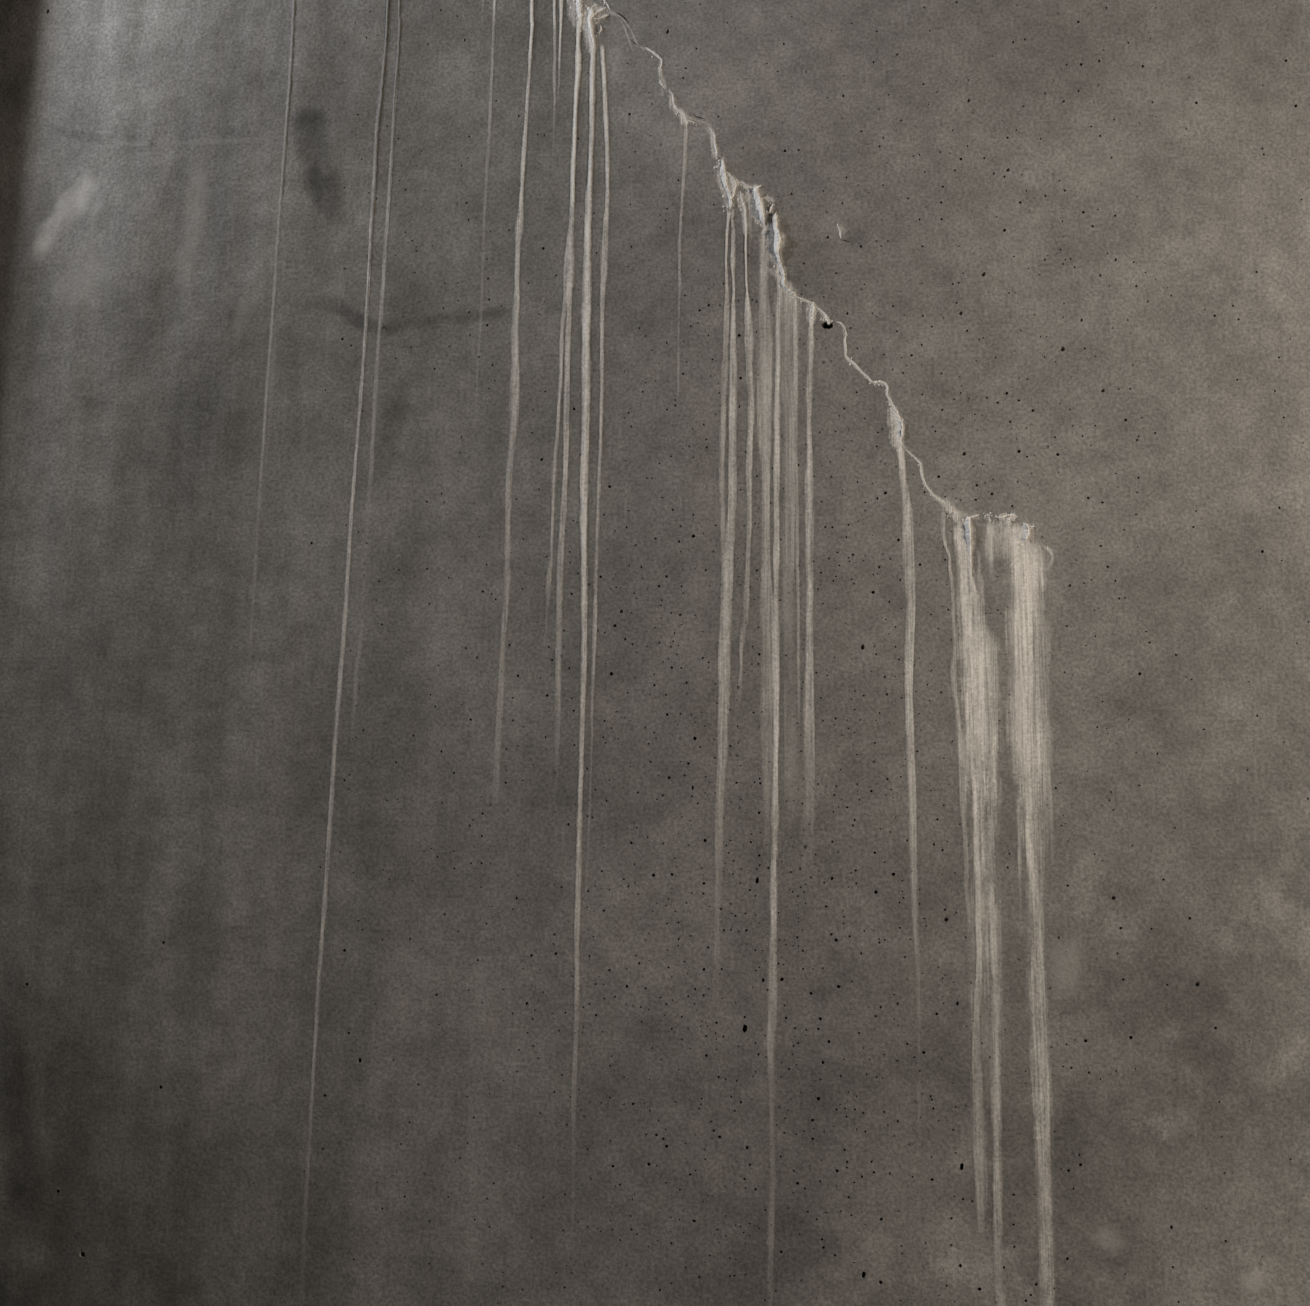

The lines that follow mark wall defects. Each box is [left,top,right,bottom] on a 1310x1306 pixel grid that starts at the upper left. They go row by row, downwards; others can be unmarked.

damp [326,203,389,852]
damp [509,0,534,462]
damp [551,0,609,940]
damp [719,210,814,940]
crack [569,0,1036,573]
damp [943,523,1053,1211]